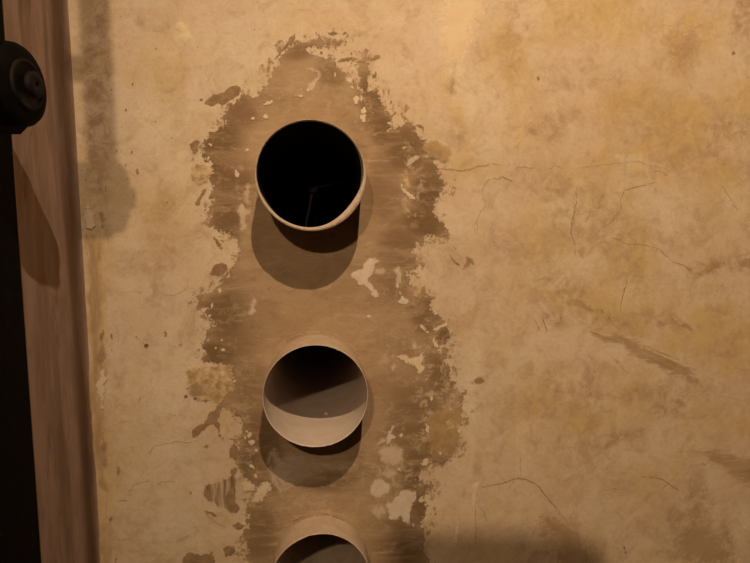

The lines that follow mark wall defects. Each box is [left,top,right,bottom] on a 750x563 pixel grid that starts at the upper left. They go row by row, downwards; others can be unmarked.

flaking render [184,364,233,403]
flaking render [426,410,469,463]
crack [475,469,566,544]